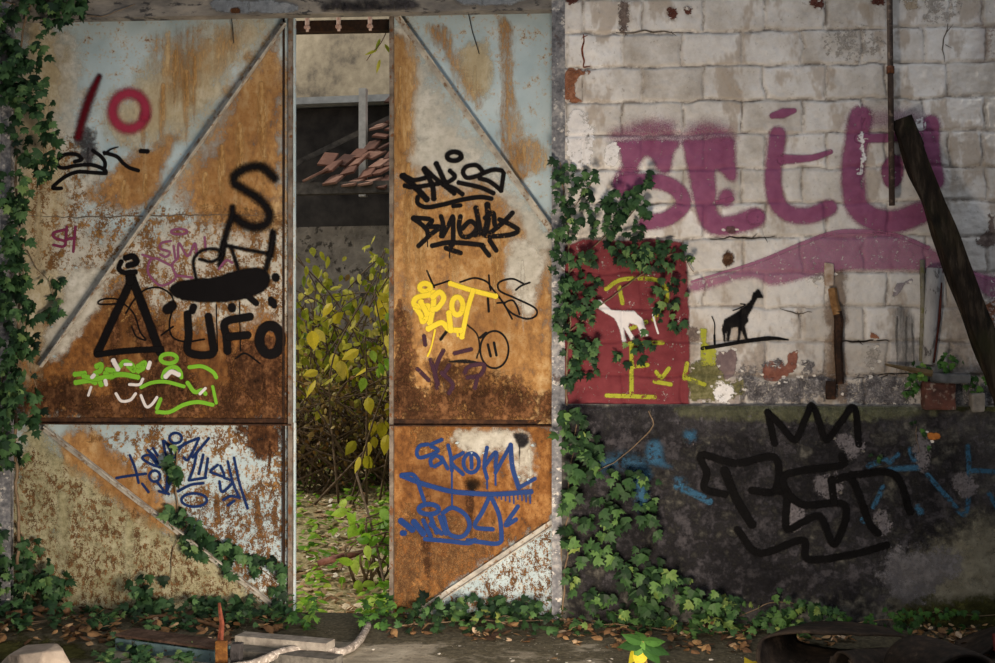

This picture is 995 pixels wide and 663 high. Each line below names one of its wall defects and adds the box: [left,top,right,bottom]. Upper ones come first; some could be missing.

peeling [975,213,995,248]
corrosion [14,7,288,609]
corrosion [394,18,552,615]
leakage [942,411,995,490]
leakage [875,510,995,608]